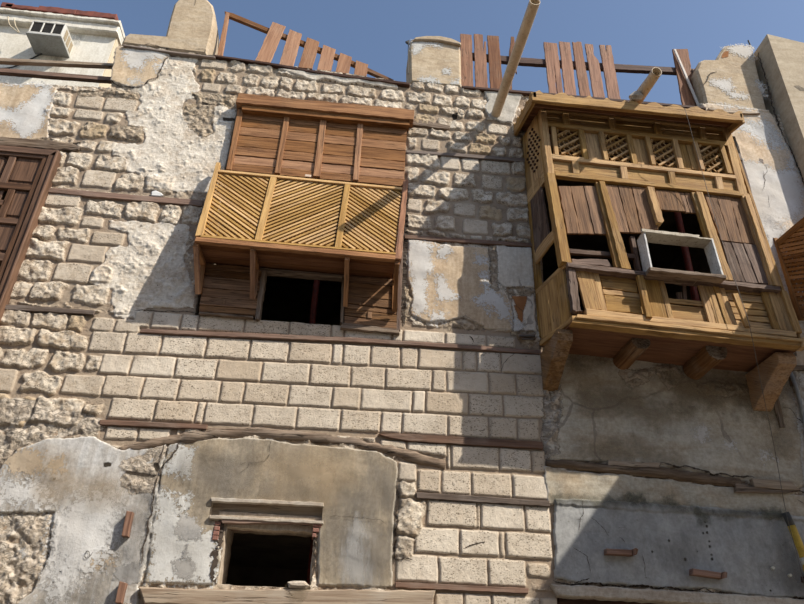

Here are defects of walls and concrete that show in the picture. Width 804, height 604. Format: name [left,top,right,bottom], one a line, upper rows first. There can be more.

peeling [0,80,80,145]
spalling [182,91,239,137]
peeling [403,240,535,336]
spalling [541,385,564,460]
peeling [0,398,223,604]
crack [141,442,179,563]
crack [553,547,732,594]